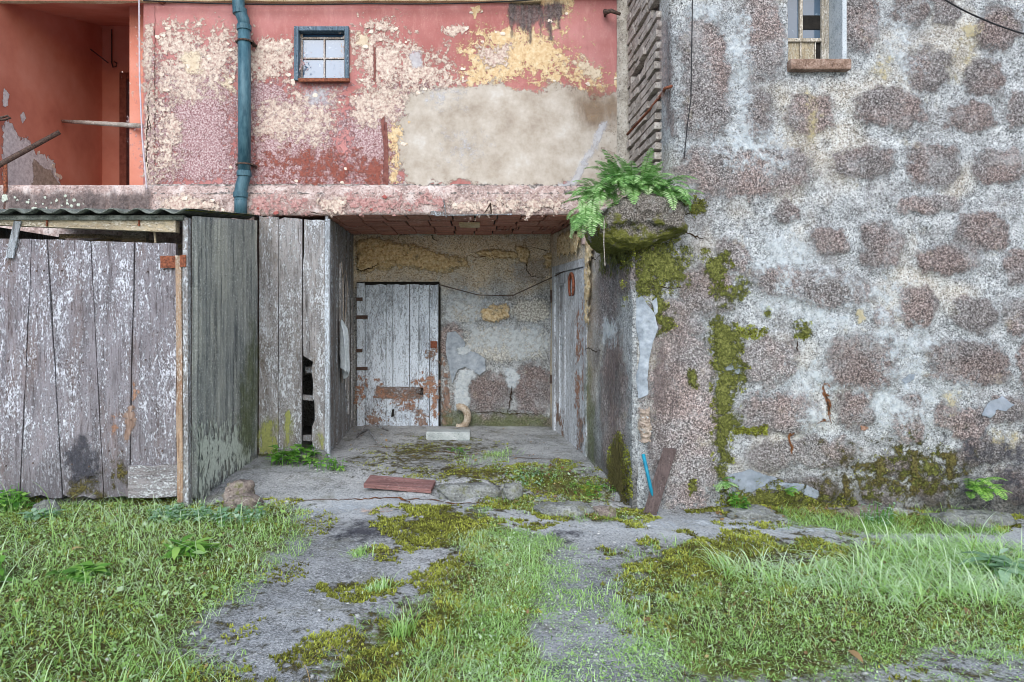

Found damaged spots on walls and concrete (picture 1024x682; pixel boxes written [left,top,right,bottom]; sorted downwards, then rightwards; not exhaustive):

water stain [508,1,564,43]
peeling [1,88,62,185]
peeling [122,12,238,222]
peeling [248,0,617,221]
spalling [355,236,518,274]
water stain [62,436,128,504]
crack [470,387,545,415]
water stain [803,384,1024,512]